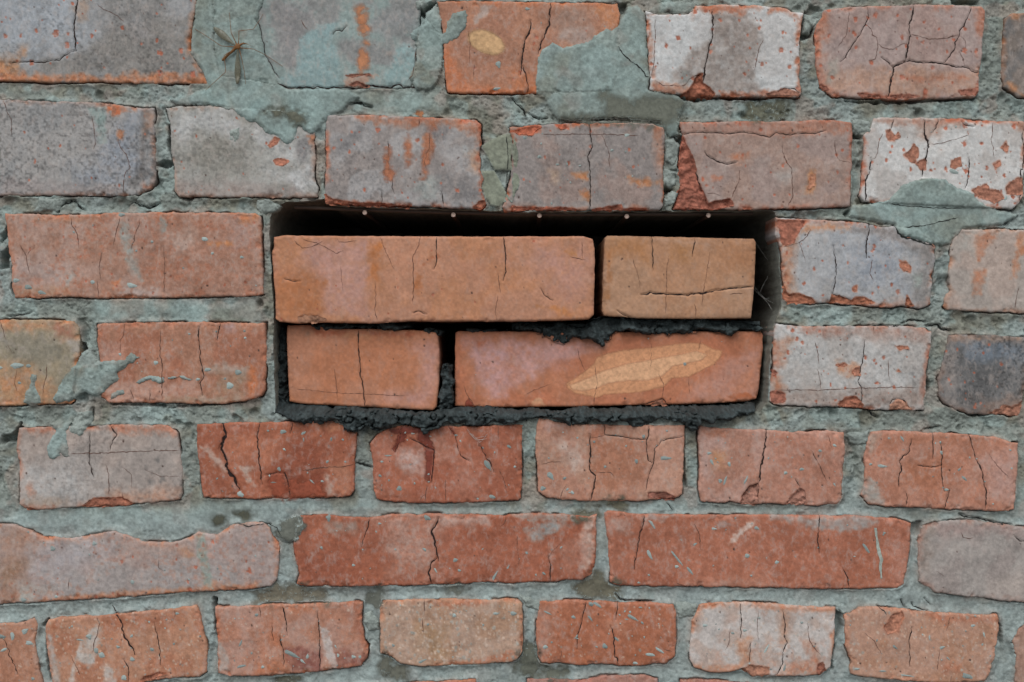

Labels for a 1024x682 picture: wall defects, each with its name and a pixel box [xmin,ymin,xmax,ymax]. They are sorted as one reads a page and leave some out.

spalling [679,73,715,102]
spalling [672,137,734,211]
crack [687,7,994,279]
spalling [905,144,926,170]
spalling [972,177,1023,204]
crack [633,237,750,316]
spalling [782,286,815,305]
spalling [829,286,873,306]
crack [220,423,371,496]
crack [577,346,690,511]
crack [898,426,1020,541]
crack [397,425,507,631]